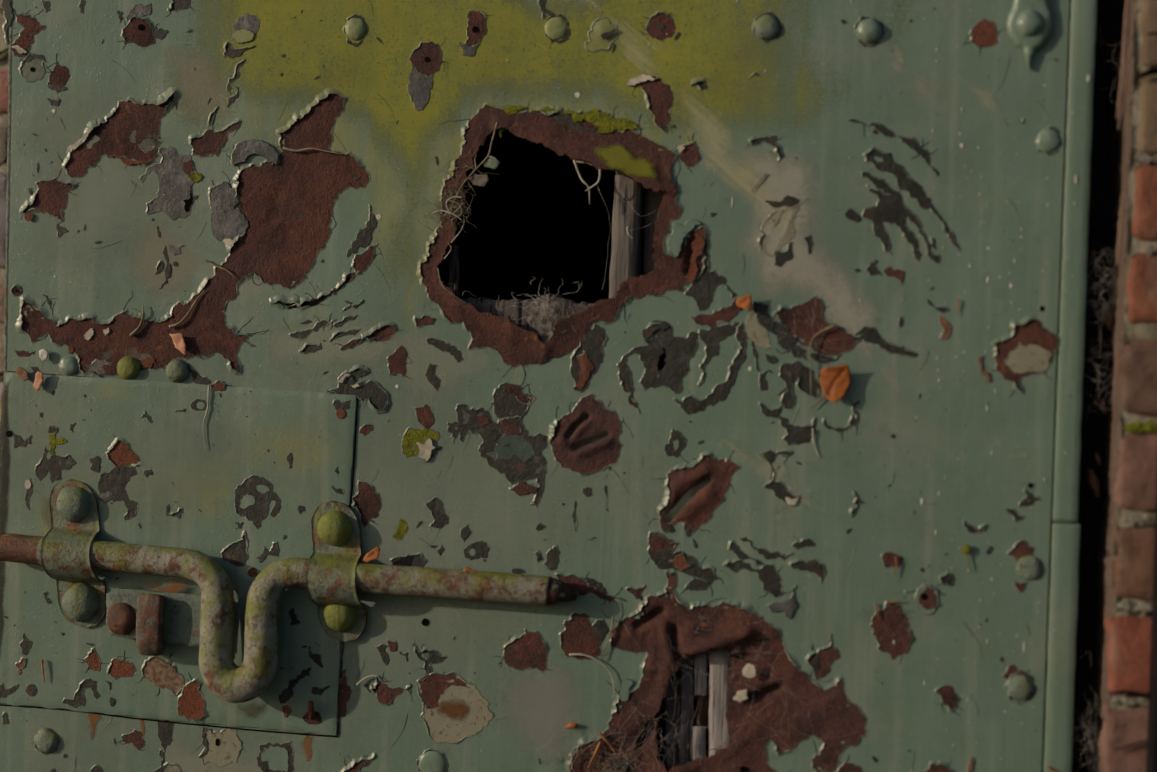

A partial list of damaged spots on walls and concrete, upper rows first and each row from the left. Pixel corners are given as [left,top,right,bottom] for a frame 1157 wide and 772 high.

peeling [844,118,961,285]
peeling [13,85,382,412]
peeling [927,299,952,340]
peeling [401,241,919,508]
peeling [425,497,490,560]
peeling [645,427,827,619]
peeling [848,490,866,518]
peeling [881,551,904,568]
peeling [369,639,495,745]
corrosion [438,702,468,719]
corrosion [833,755,863,772]